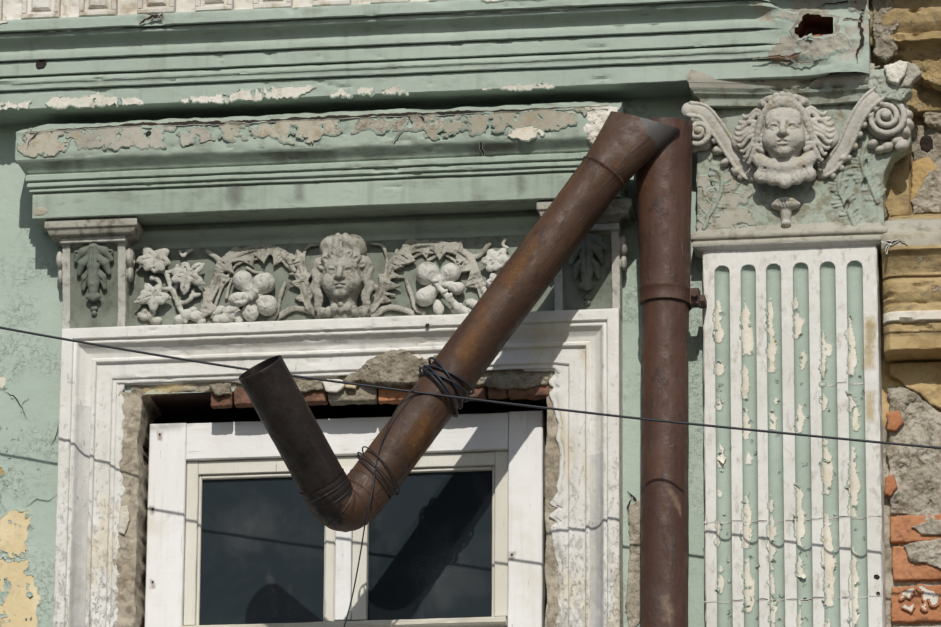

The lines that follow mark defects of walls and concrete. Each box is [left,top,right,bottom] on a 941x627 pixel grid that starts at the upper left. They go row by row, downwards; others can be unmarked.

peeling [45,91,144,110]
peeling [179,84,316,104]
peeling [17,105,620,158]
crack [753,0,880,74]
peeling [770,0,941,104]
spalling [294,349,437,408]
peeling [0,426,43,627]
spalling [111,381,254,627]
spalling [469,369,560,627]
spalling [625,500,641,627]
peeling [713,438,865,627]
spalling [886,386,941,627]